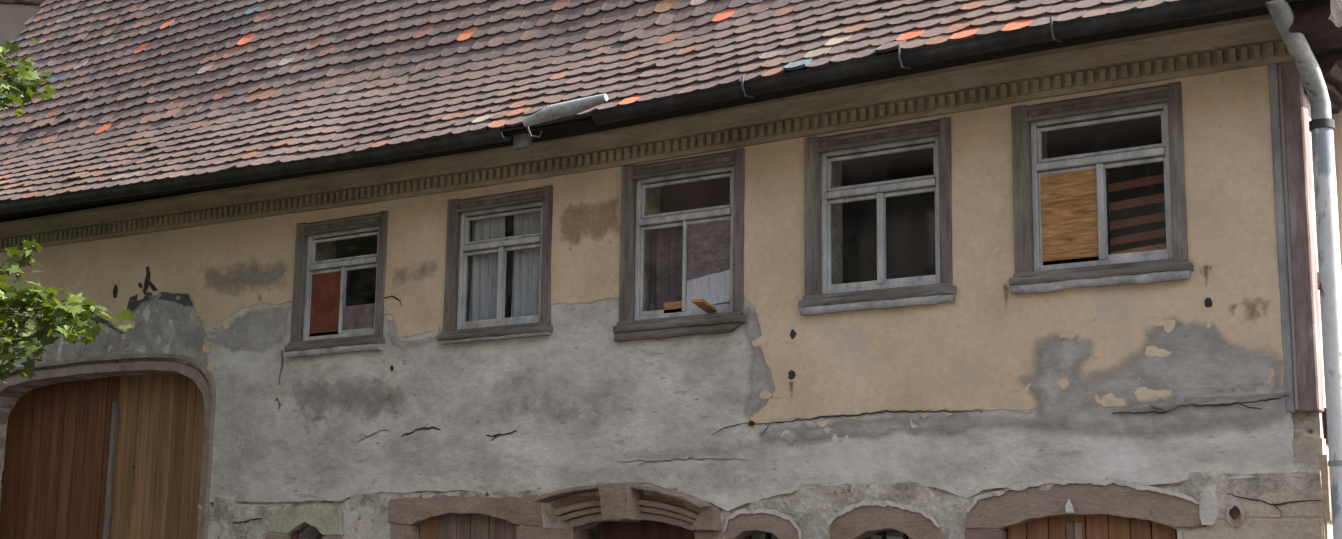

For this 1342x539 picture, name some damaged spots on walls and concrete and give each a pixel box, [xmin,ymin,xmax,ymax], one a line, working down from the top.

flaking render [26,282,288,373]
flaking render [745,294,1283,445]
crack [616,410,983,465]
spalling [1199,485,1245,527]